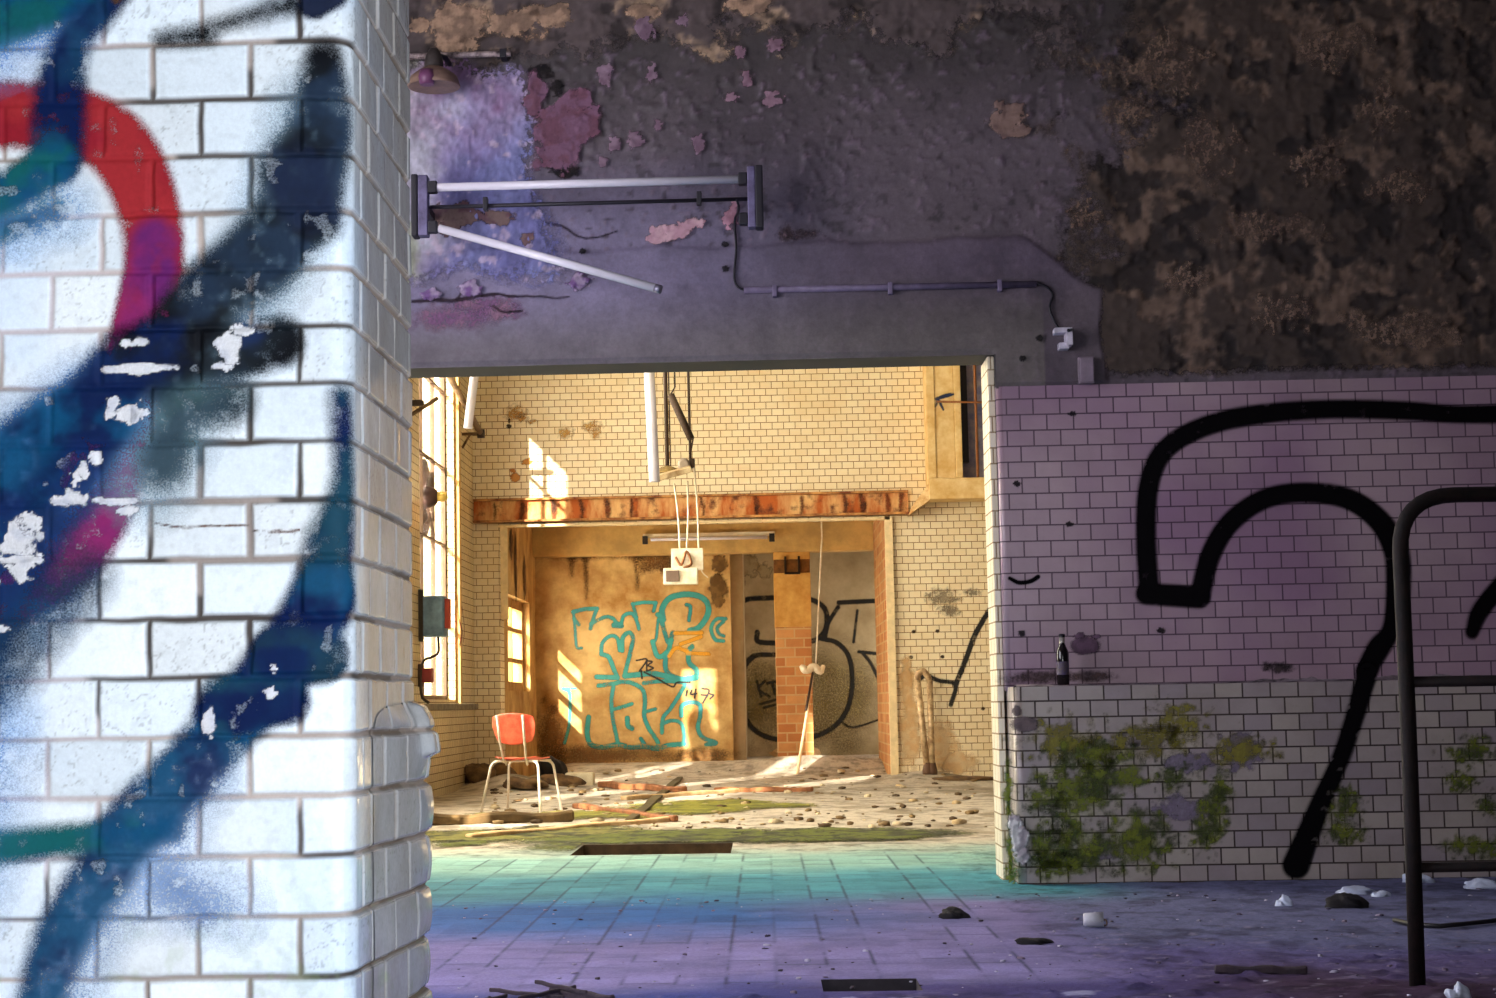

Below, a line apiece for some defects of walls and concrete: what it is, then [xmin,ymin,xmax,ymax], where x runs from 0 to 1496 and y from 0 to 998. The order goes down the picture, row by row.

peeling [407,0,1496,377]
peeling [101,338,179,376]
peeling [211,324,255,372]
peeling [105,396,150,426]
peeling [0,451,151,584]